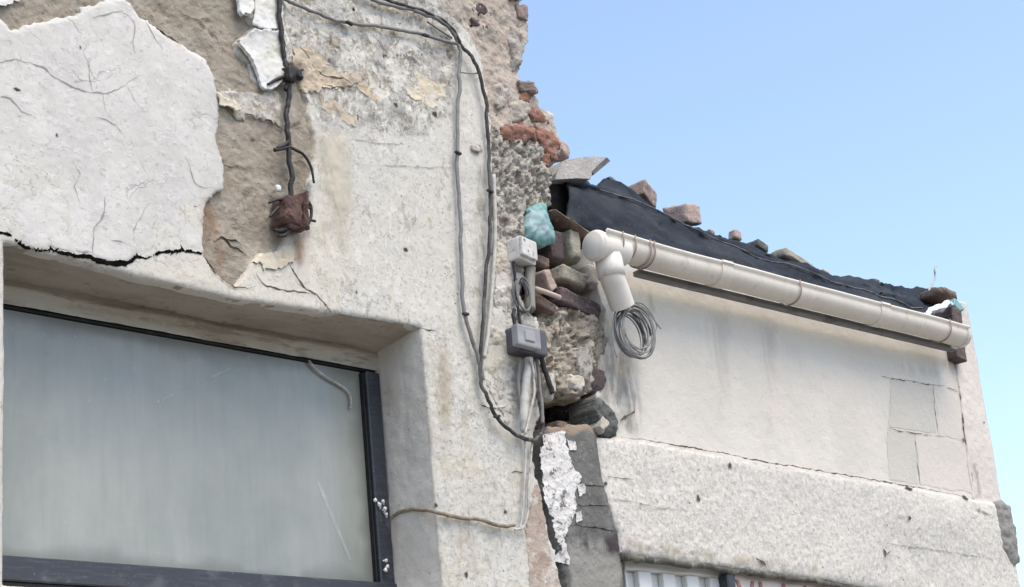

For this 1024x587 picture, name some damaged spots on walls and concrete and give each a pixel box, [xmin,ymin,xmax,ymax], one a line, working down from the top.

spalling [0,0,105,31]
spalling [126,0,380,285]
peeling [405,72,447,108]
spalling [440,0,570,167]
crack [0,199,332,313]
peeling [484,242,586,587]